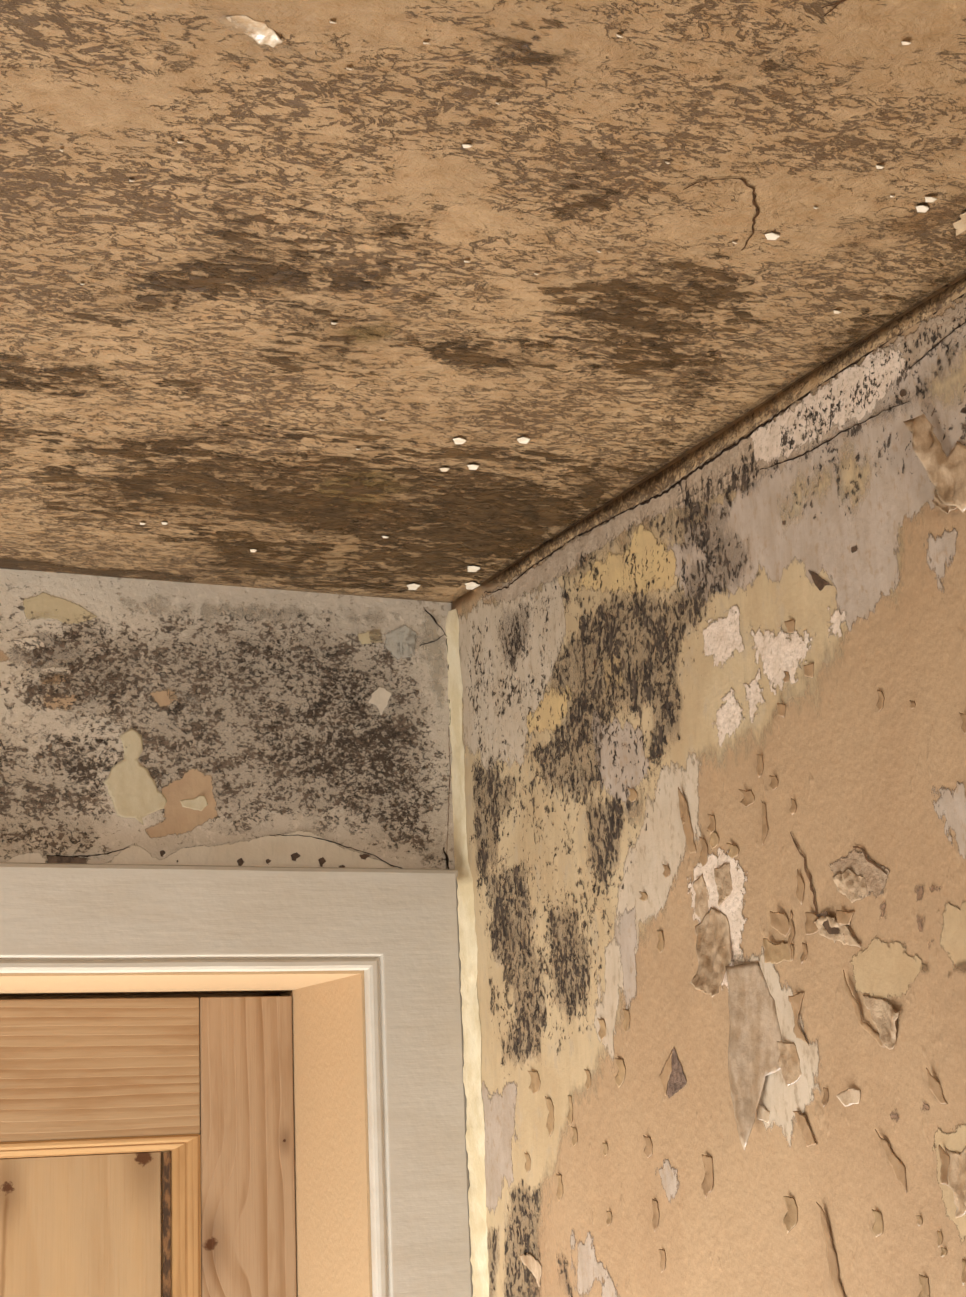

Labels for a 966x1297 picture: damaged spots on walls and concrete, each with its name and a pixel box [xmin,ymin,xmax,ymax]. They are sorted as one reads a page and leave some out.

peeling [219,15,291,50]
crack [822,0,847,17]
crack [683,178,760,251]
damp [53,204,766,411]
damp [0,353,689,594]
peeling [0,592,97,710]
damp [0,588,449,867]
peeling [369,687,392,715]
flaking render [46,847,129,864]
damp [468,512,759,1079]
peeling [459,296,966,1297]
damp [487,1180,542,1297]